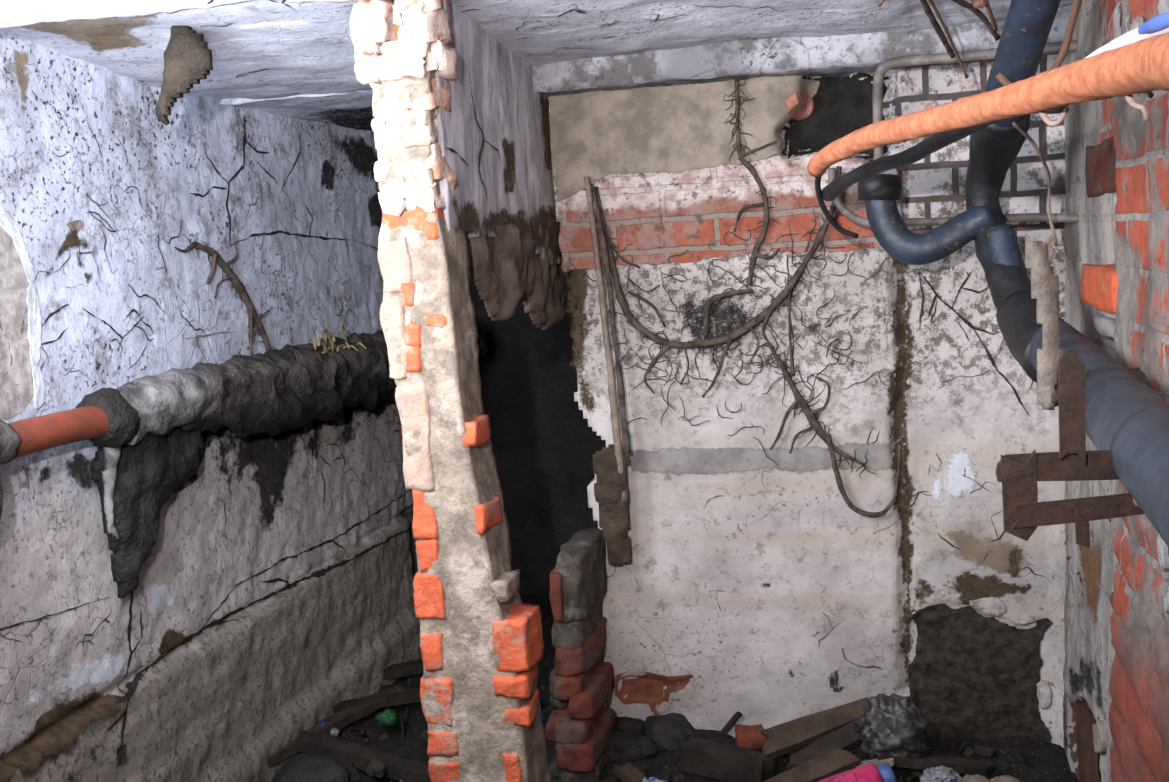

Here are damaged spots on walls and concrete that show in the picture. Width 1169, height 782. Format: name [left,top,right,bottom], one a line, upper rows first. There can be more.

peeling [1036,53,1063,75]
crack [0,112,378,385]
mould [309,107,382,229]
flaking render [549,59,994,272]
peeling [999,113,1066,249]
damp [887,331,914,445]
damp [173,446,207,493]
efflorescence [931,449,976,501]
crack [0,421,412,761]
damp [907,548,1067,755]